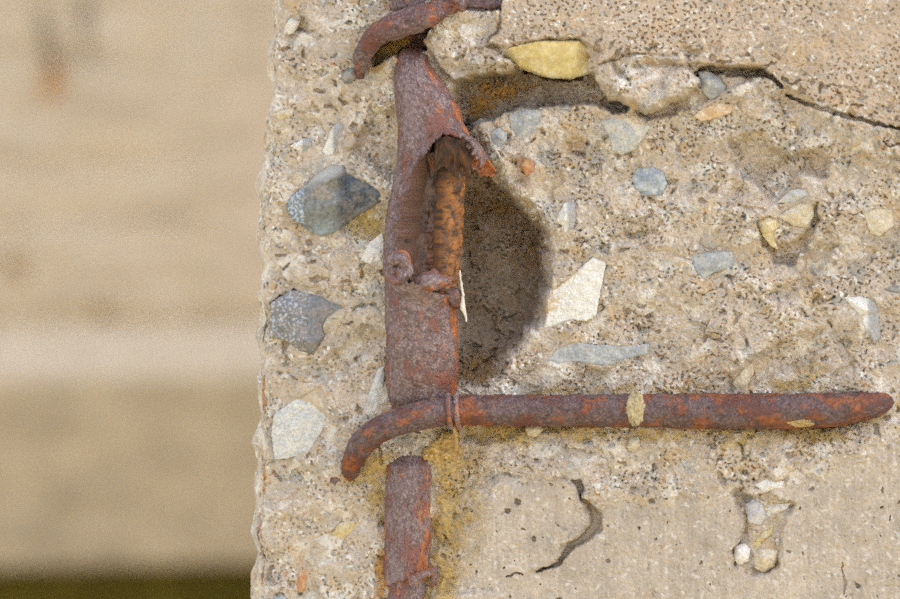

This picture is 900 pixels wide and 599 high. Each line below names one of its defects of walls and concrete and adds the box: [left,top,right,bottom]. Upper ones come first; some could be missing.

rust [368,36,410,71]
crack [691,64,900,149]
rust [352,128,496,298]
spalling [250,0,900,599]
rust [467,425,529,445]
rust [782,427,847,443]
rust [408,444,477,599]
crack [505,478,606,578]
rust [374,550,386,597]